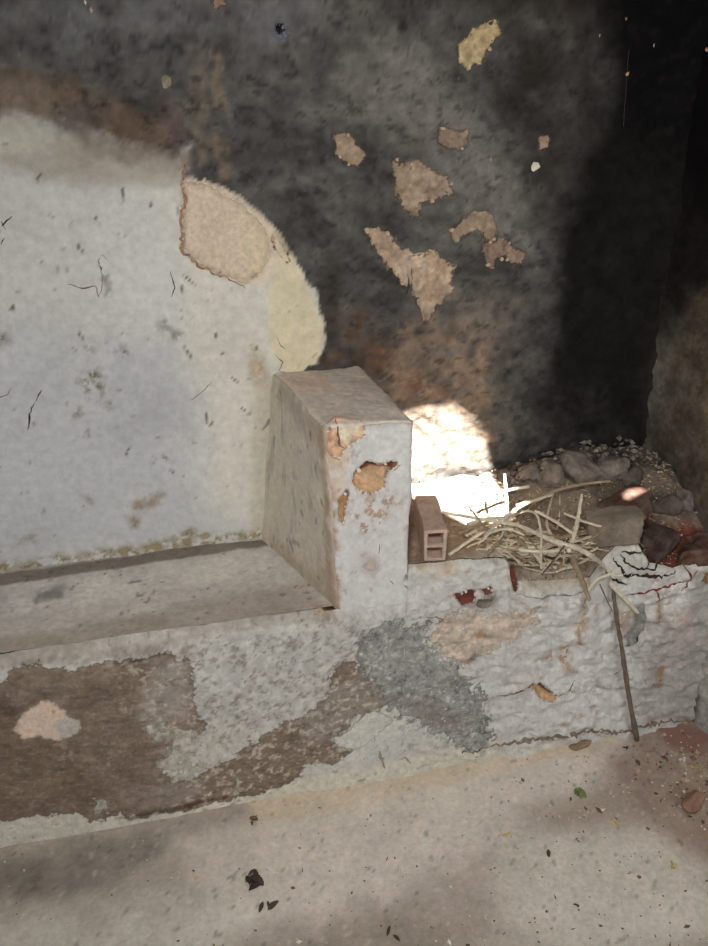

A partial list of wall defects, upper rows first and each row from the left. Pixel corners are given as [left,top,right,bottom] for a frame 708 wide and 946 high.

spalling [458,19,502,71]
spalling [332,133,366,166]
spalling [179,150,290,288]
spalling [392,158,453,219]
spalling [448,210,526,270]
spalling [364,227,457,321]
spalling [327,417,367,459]
spalling [338,461,399,523]
peeling [332,586,539,760]
peeling [13,700,82,741]